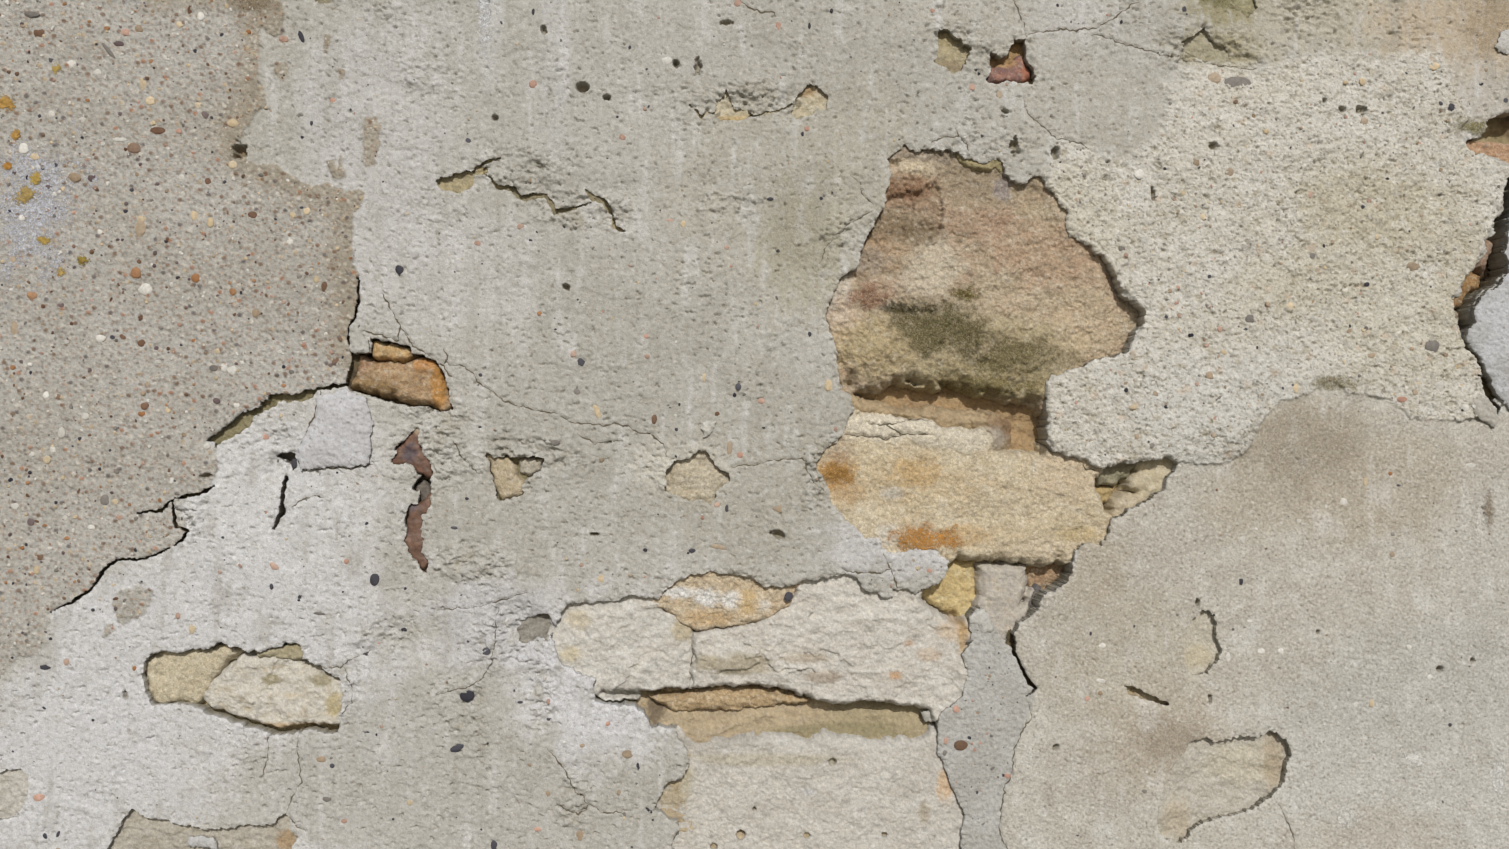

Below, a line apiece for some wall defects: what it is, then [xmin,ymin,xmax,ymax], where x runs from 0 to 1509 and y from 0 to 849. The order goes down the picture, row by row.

spalling [986,39,1036,84]
peeling [1451,98,1509,429]
spalling [348,320,453,412]
crack [292,277,667,507]
crack [1464,344,1501,415]
crack [50,485,215,613]
spalling [391,428,434,573]
spalling [517,135,1178,849]
peeling [107,809,298,849]
spalling [121,642,343,735]
crack [934,629,1037,849]
peeling [1157,730,1292,843]